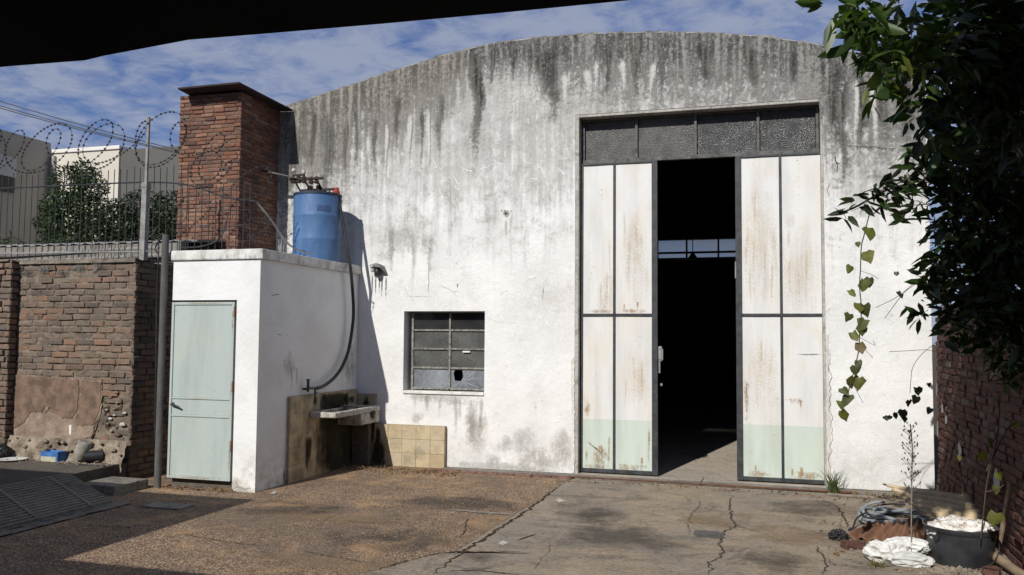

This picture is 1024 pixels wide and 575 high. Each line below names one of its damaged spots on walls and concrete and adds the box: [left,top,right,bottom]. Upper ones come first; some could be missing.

leakage [278,32,925,238]
flaking render [6,374,126,477]
leakage [306,393,369,471]
leakage [371,422,385,465]
crack [707,496,752,575]